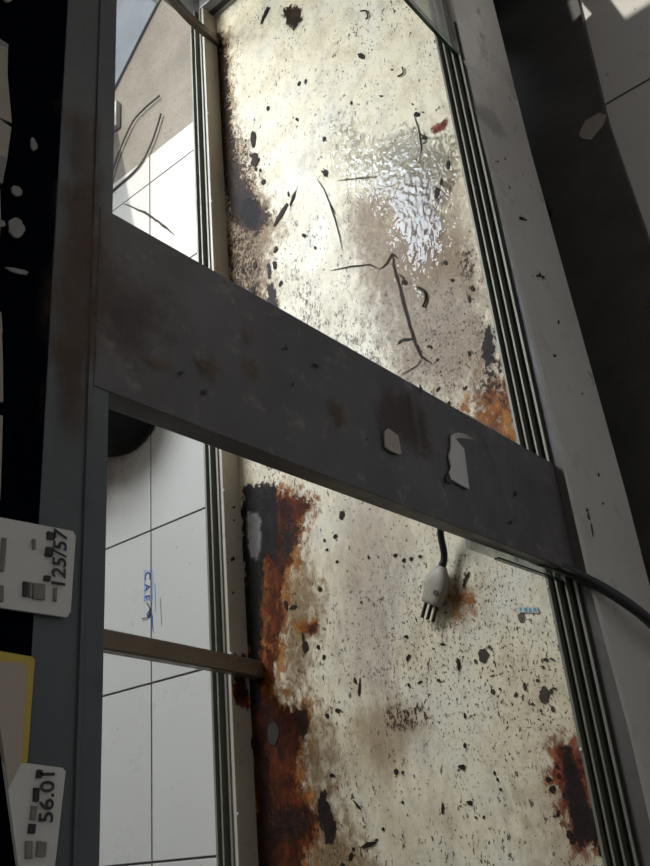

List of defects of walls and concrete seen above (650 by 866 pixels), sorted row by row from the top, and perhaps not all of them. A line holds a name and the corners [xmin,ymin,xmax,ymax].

crack [317,179,432,375]
corrosion [460,379,517,443]
corrosion [232,476,375,866]